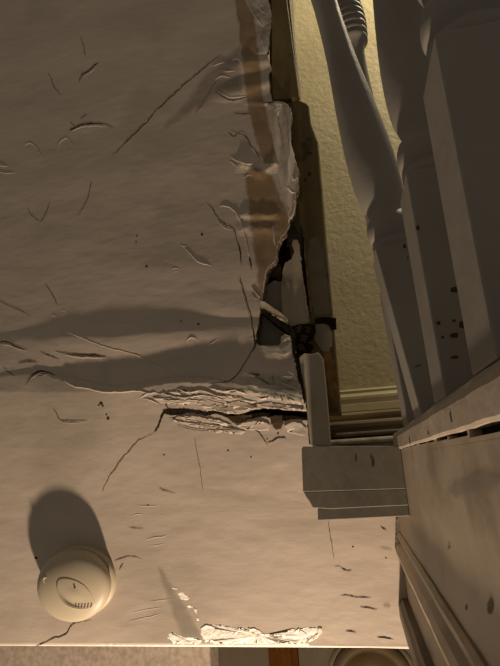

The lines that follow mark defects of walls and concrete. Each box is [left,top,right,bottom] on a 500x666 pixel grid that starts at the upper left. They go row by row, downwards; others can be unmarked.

crack [115,55,221,153]
crack [196,82,250,114]
crack [263,75,274,103]
spalling [268,222,304,284]
crack [207,203,256,385]
crack [102,400,308,492]
spalling [171,414,245,434]
peeling [168,587,322,645]